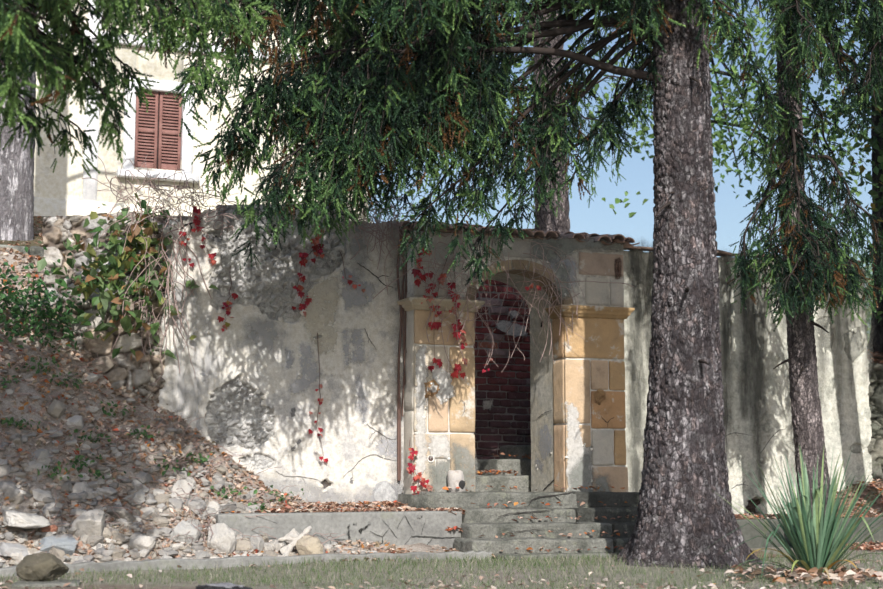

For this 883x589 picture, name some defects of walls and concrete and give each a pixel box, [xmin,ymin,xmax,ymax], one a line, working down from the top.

spalling [205,375,276,472]
spalling [202,204,367,426]
flaking render [414,345,454,487]
damp [722,256,767,482]